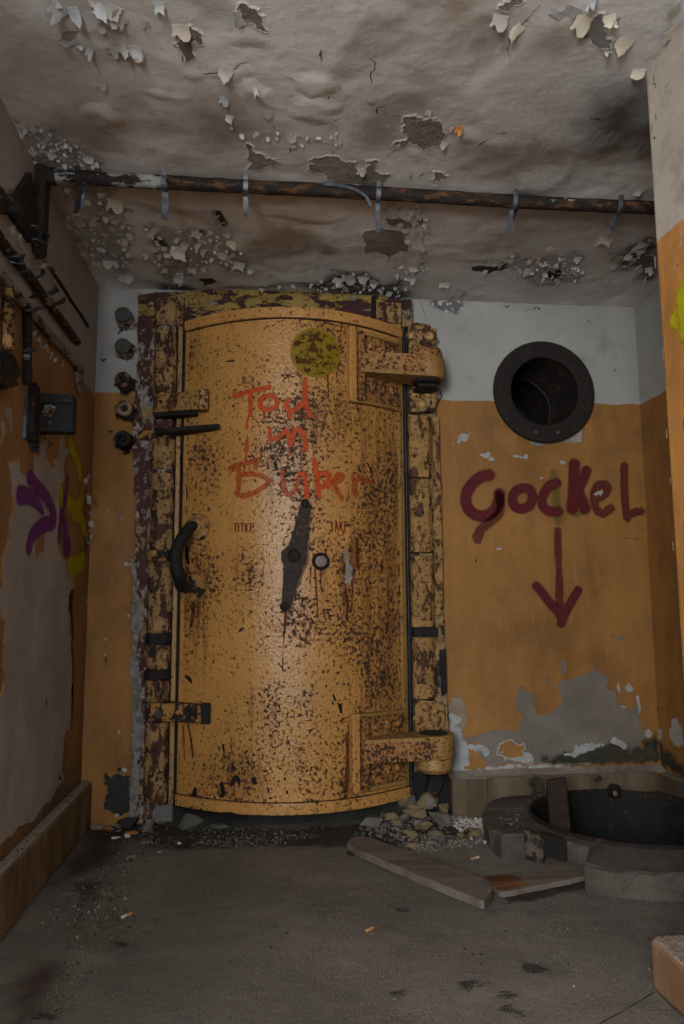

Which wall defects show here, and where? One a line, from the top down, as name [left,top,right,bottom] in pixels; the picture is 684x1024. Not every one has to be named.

peeling [47,0,206,64]
peeling [233,0,270,34]
peeling [490,0,527,44]
peeling [548,0,634,57]
peeling [218,65,463,188]
peeling [50,185,254,292]
peeling [472,229,658,287]
peeling [0,404,87,847]
corrosion [310,566,322,620]
corrosion [343,538,360,621]
spalling [102,552,146,817]
peeling [448,658,684,768]